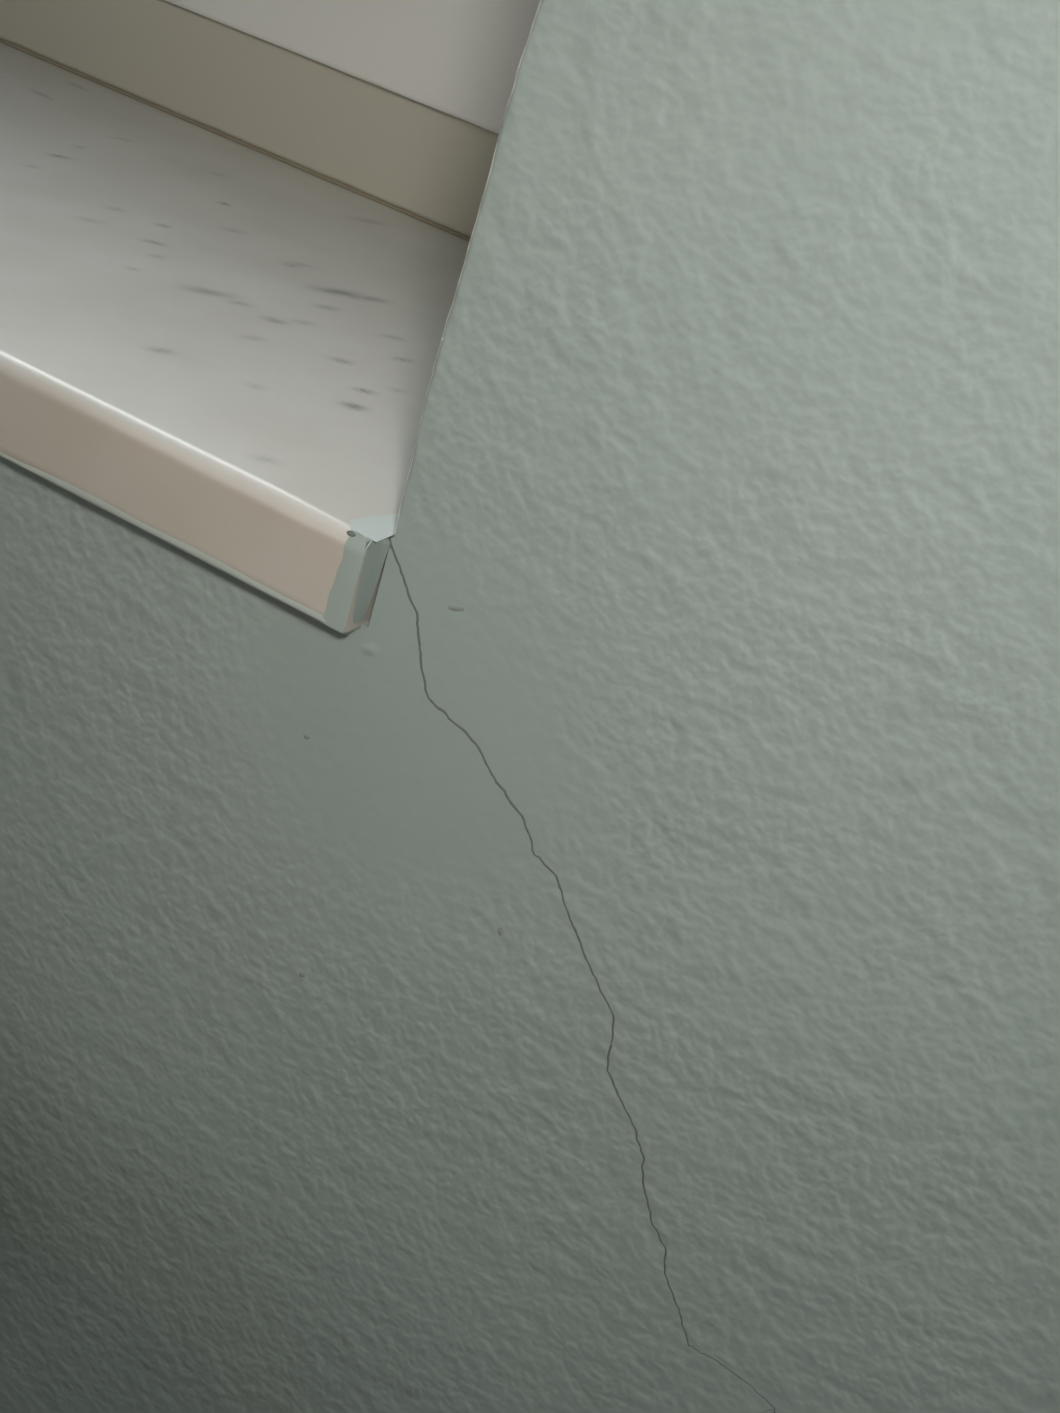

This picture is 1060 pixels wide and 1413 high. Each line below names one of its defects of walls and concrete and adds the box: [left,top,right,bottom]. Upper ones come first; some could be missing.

crack [388,536,776,1413]